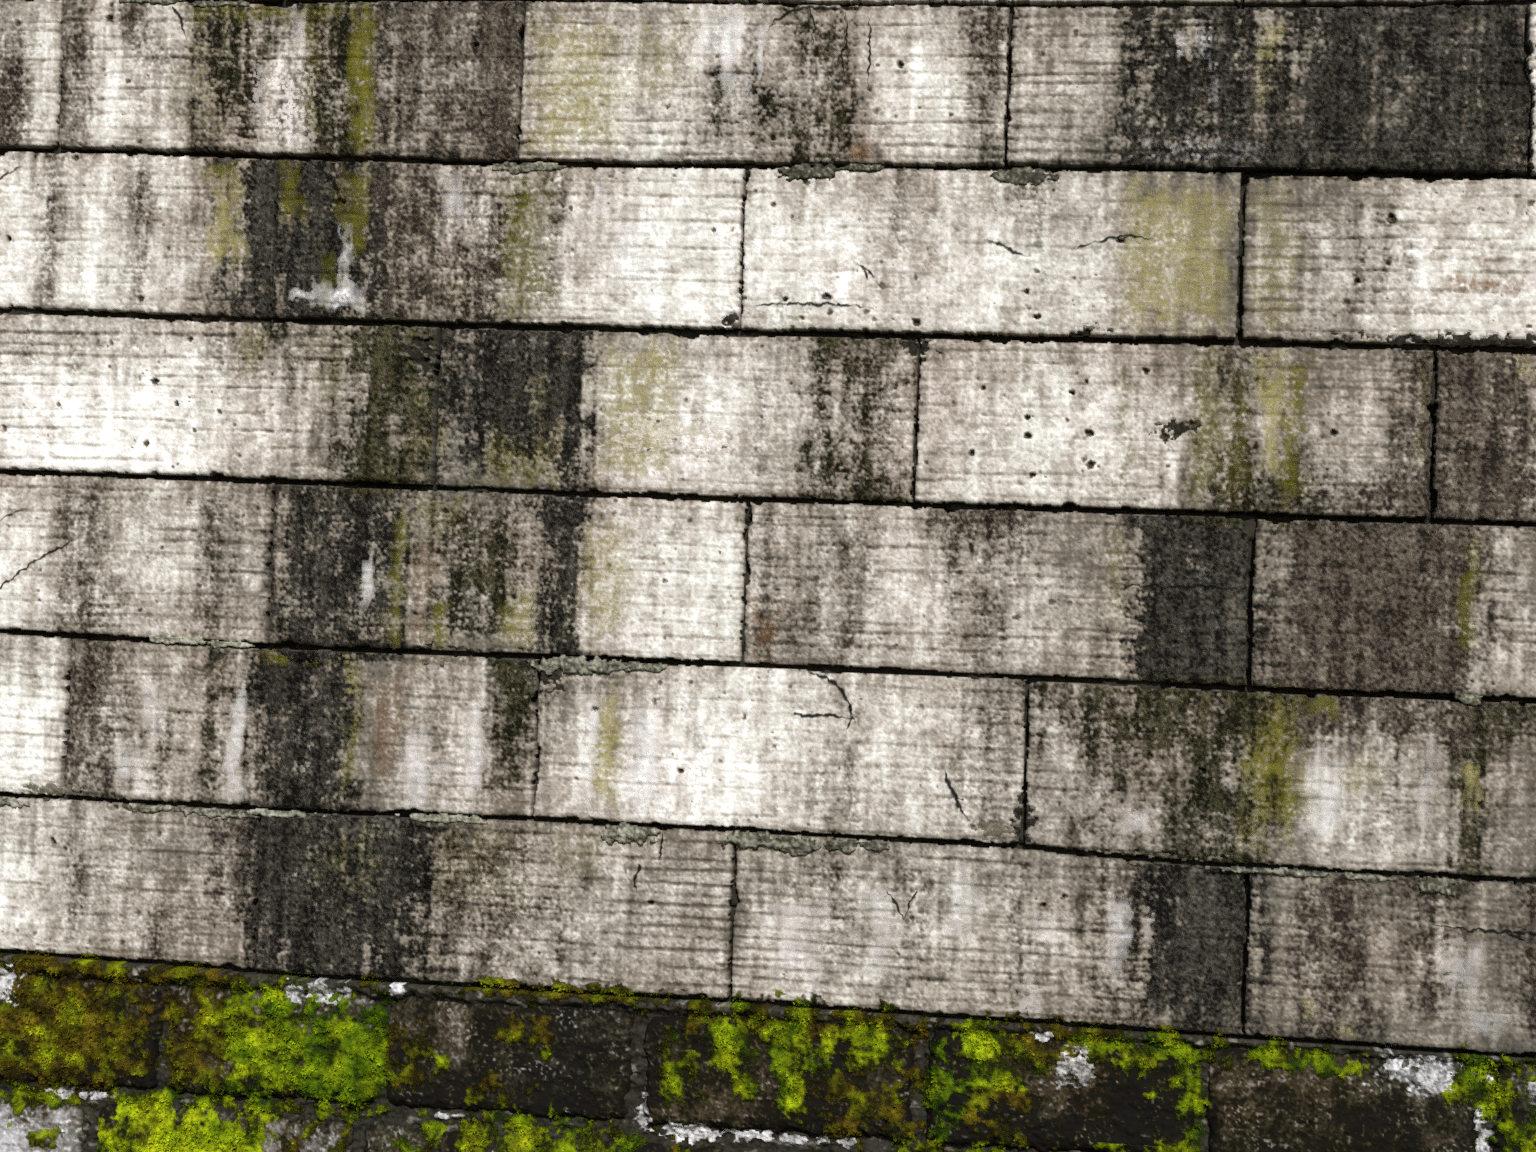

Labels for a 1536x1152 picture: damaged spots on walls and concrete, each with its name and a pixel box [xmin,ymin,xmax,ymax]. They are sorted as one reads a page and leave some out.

leakage [110,2,144,34]
leakage [968,7,1021,159]
leakage [1104,0,1529,177]
crack [0,534,82,589]
leakage [56,484,106,539]
leakage [153,1,596,982]
crack [794,671,856,736]
leakage [979,349,1536,1039]